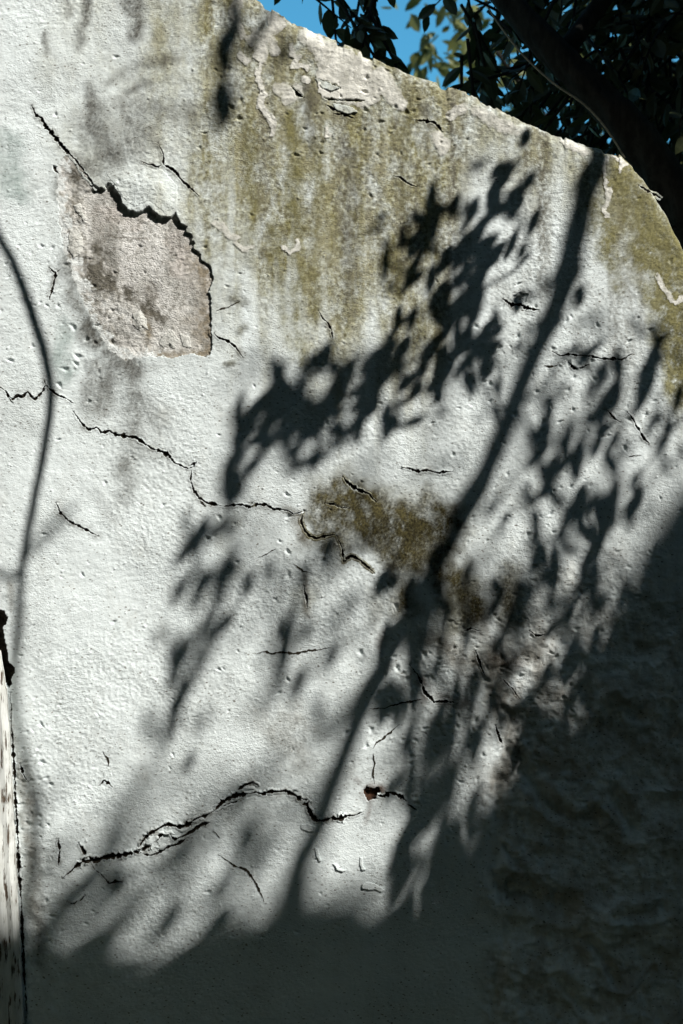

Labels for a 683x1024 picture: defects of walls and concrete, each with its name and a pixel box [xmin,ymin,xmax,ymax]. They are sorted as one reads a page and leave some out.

crack [30,106,99,191]
crack [141,142,200,197]
water stain [229,0,407,221]
peeling [315,79,357,114]
water stain [433,130,451,156]
water stain [560,138,589,156]
water stain [601,155,628,218]
flaking render [53,155,214,361]
water stain [656,238,683,379]
crack [0,380,377,574]
crack [55,664,458,906]
crack [8,693,30,1024]